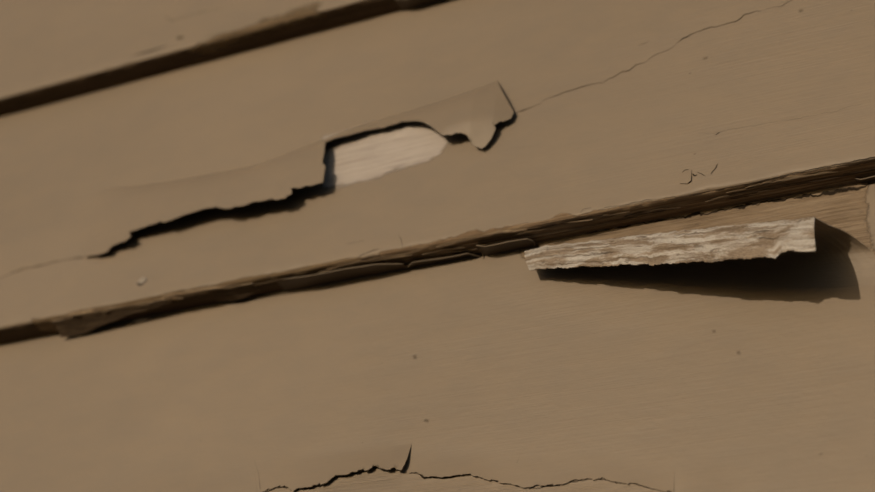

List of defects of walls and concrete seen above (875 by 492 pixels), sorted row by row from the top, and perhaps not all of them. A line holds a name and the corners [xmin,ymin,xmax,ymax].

peeling [75,81,514,258]
peeling [277,176,875,292]
peeling [257,444,675,492]